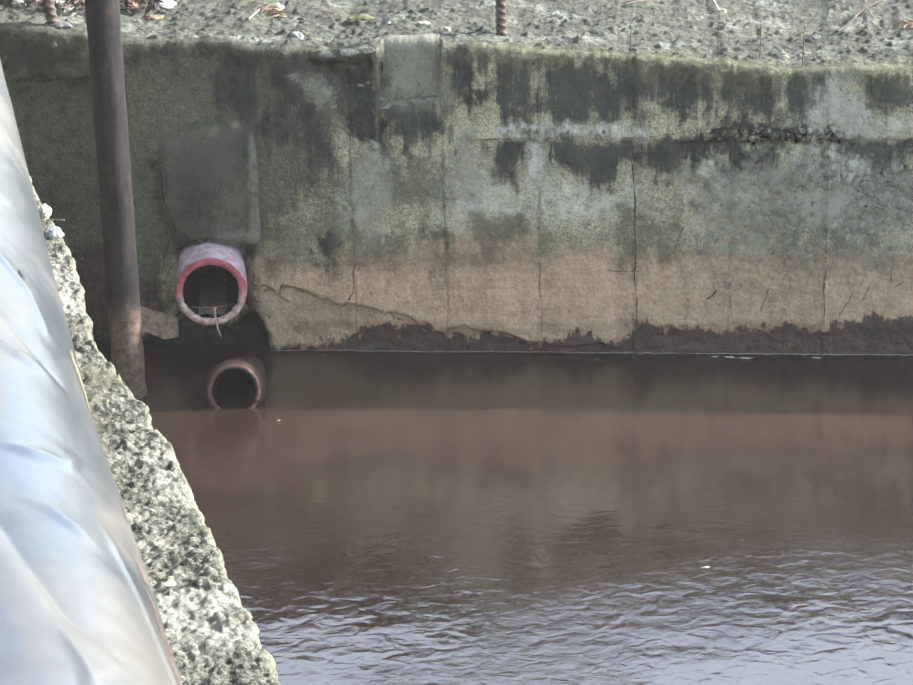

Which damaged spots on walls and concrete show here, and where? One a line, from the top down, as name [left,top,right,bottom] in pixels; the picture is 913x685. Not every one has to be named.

corrosion [71,244,110,339]
water stain [150,55,340,233]
water stain [310,230,340,274]
water stain [143,310,913,356]
water stain [335,41,913,253]
crack [485,119,903,329]